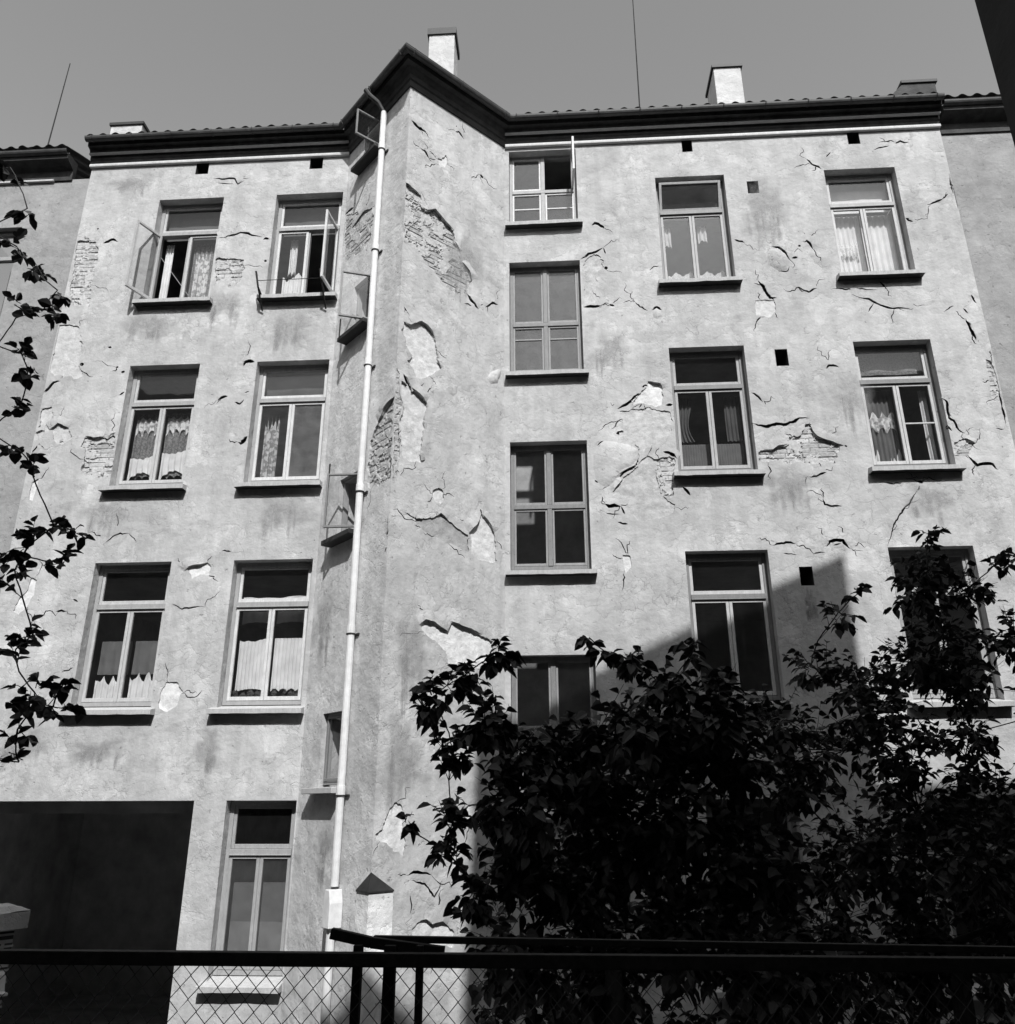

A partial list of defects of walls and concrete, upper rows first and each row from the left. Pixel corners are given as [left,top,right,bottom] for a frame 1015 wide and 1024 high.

crack [796,150,830,171]
flaking render [404,177,481,309]
crack [576,218,614,269]
crack [734,232,987,344]
flaking render [367,306,444,509]
flaking render [601,377,694,525]
flaking render [752,410,848,480]
crack [939,393,1003,475]
flaking render [397,472,502,563]
crack [757,463,941,555]
flaking render [400,605,498,672]
flaking render [373,787,412,857]